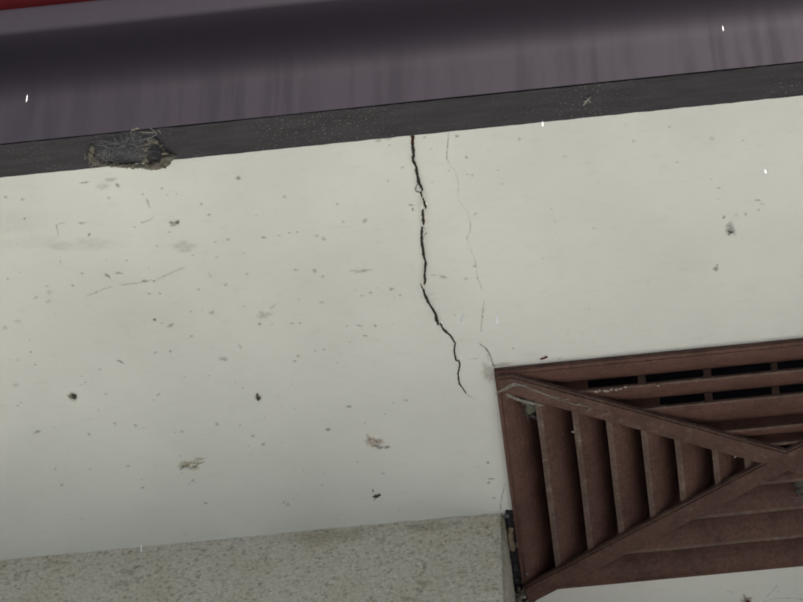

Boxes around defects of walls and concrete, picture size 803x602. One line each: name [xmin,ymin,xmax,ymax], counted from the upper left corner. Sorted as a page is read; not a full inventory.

crack [411,135,466,393]